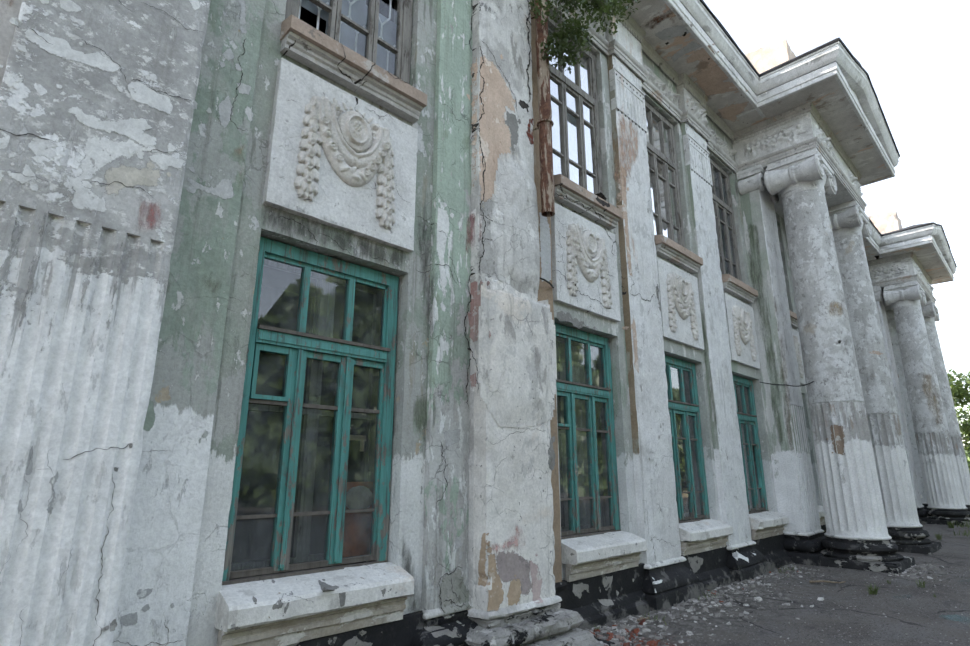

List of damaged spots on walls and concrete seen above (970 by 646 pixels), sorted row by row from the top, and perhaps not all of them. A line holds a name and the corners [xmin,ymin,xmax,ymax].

peeling [10,17,120,72]
peeling [116,82,173,114]
crack [217,40,245,131]
peeling [65,106,233,213]
crack [371,0,531,408]
peeling [466,54,534,342]
peeling [143,400,155,431]
peeling [826,425,845,455]
crack [0,443,165,585]
crack [93,472,183,646]
crack [439,566,465,618]
peeling [424,533,543,646]